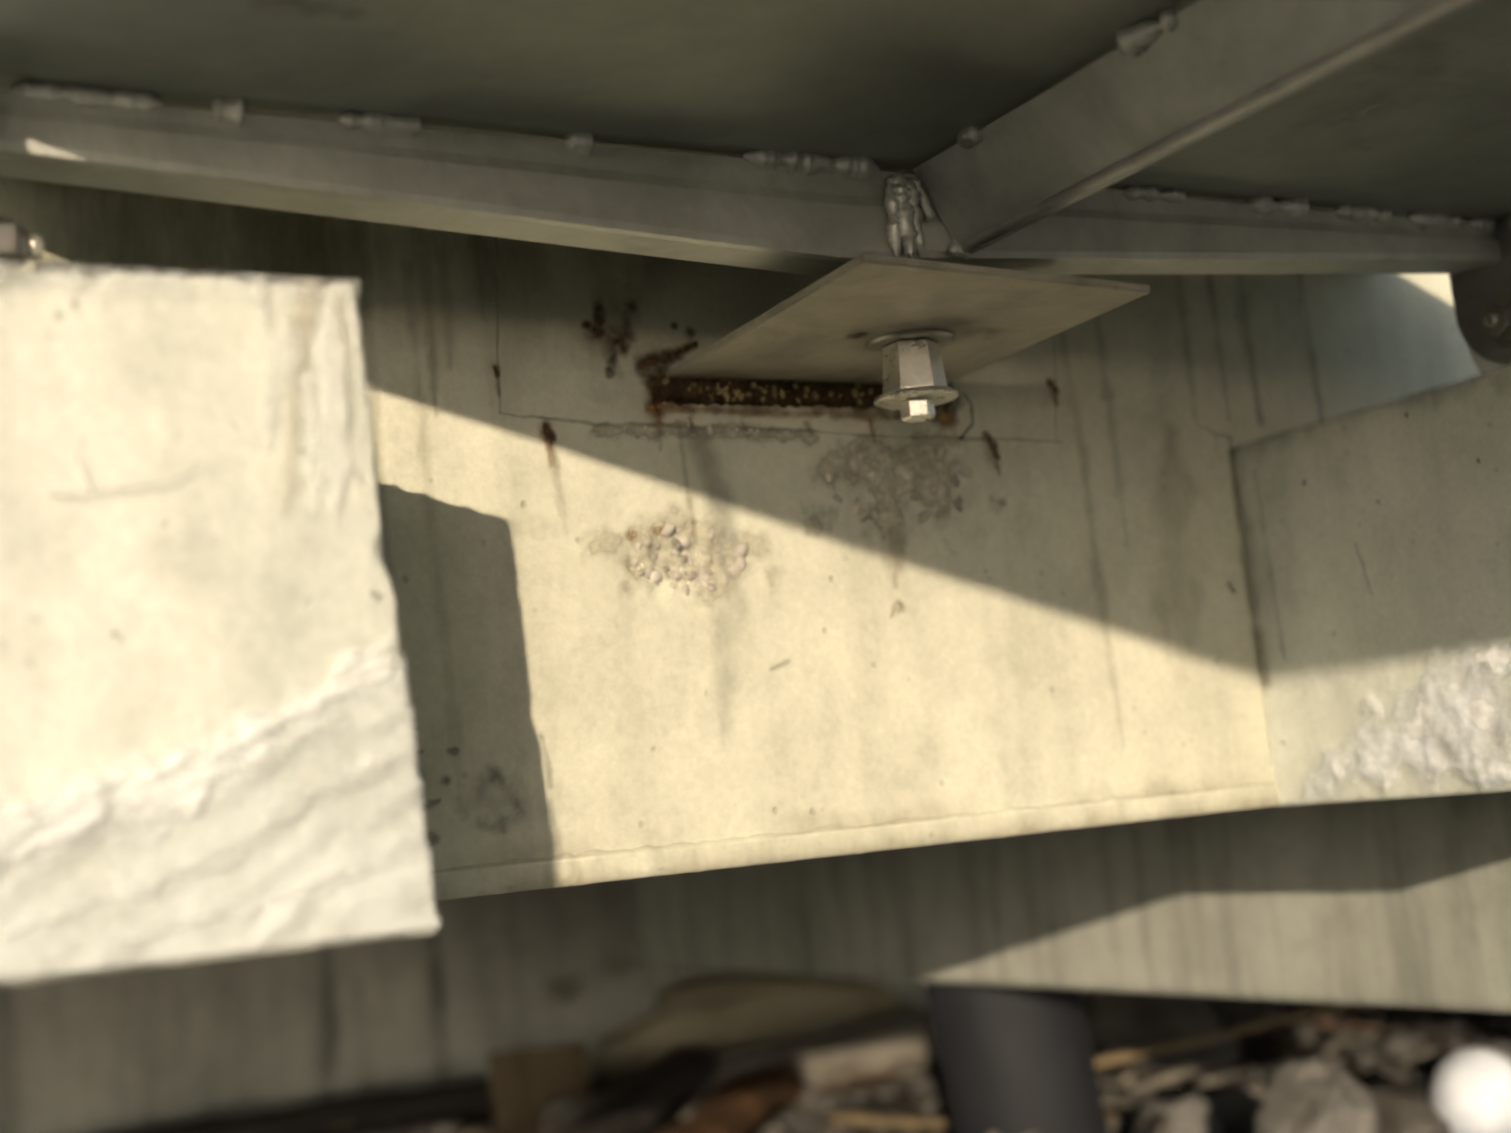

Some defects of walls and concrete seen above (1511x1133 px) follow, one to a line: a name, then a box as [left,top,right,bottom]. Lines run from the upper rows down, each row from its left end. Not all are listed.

spalling [593,420,818,445]
rust [582,302,901,439]
rust [933,382,959,424]
spalling [590,507,765,602]